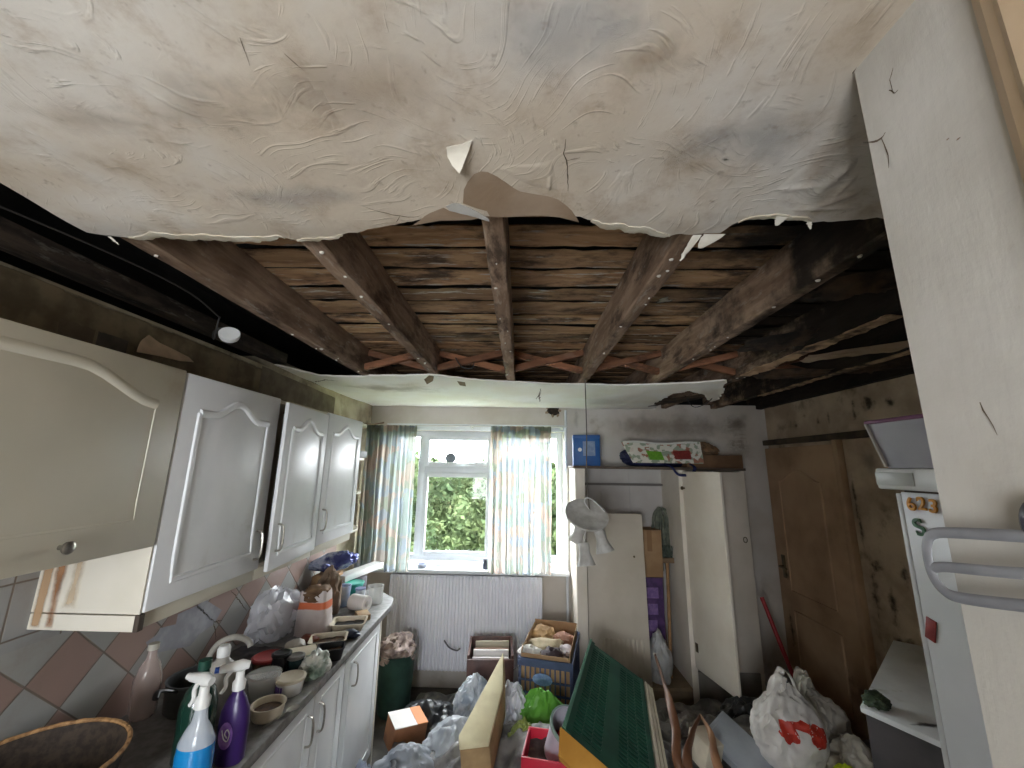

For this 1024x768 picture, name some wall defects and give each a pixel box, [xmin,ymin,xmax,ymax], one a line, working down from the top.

crack [563,139,578,186]
crack [863,133,889,168]
flaking render [412,140,671,238]
flaking render [128,231,343,243]
flaking render [738,214,811,223]
flaking render [0,265,262,392]